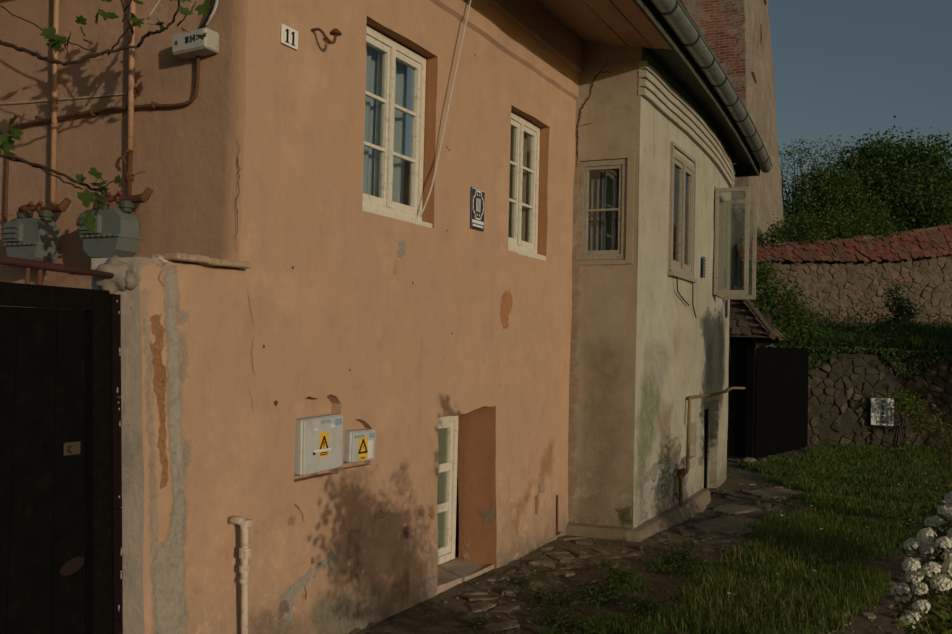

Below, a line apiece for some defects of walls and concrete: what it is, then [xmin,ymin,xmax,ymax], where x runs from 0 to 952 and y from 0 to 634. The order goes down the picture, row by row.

crack [576,59,611,168]
crack [234,139,242,253]
peeling [93,255,190,634]
spalling [640,458,698,521]
peeling [276,548,337,626]